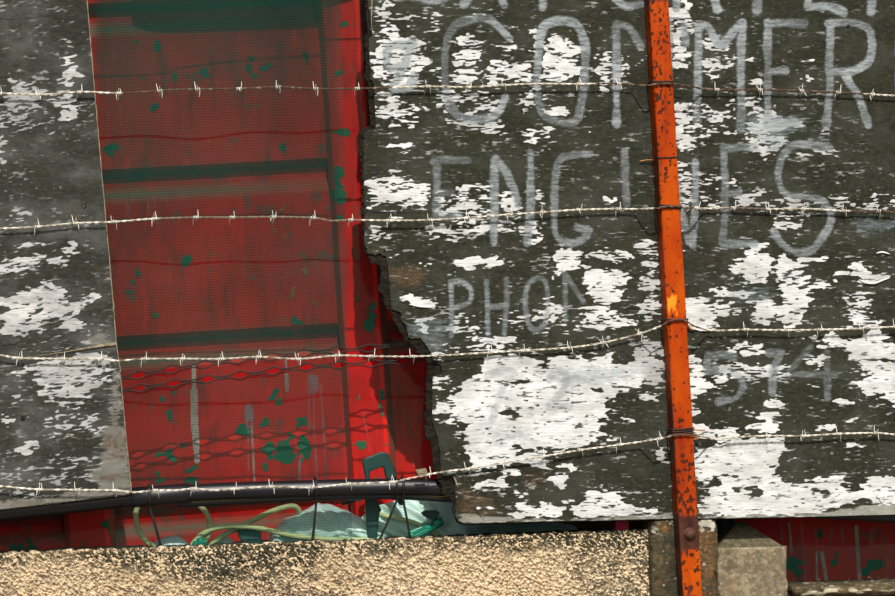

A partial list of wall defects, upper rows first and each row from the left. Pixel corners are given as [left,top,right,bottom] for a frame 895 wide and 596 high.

peeling [0,241,80,275]
peeling [0,39,84,164]
peeling [2,454,102,483]
peeling [0,280,118,456]
peeling [364,169,543,245]
peeling [370,0,644,154]
peeling [399,239,665,533]
peeling [656,447,670,464]
peeling [669,0,754,79]
peeling [674,92,895,235]
peeling [685,243,895,415]
peeling [689,337,895,532]